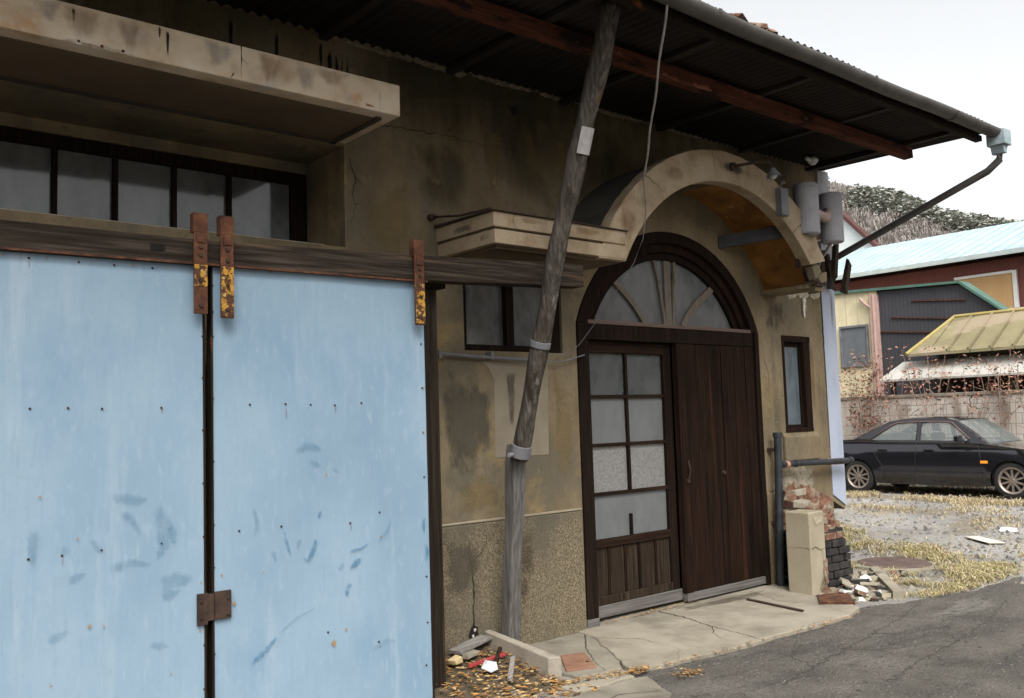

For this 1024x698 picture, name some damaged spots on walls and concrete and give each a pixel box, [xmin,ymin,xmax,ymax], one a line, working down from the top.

water stain [319,44,349,73]
water stain [446,388,489,462]
spalling [783,480,834,519]
crack [469,535,487,624]